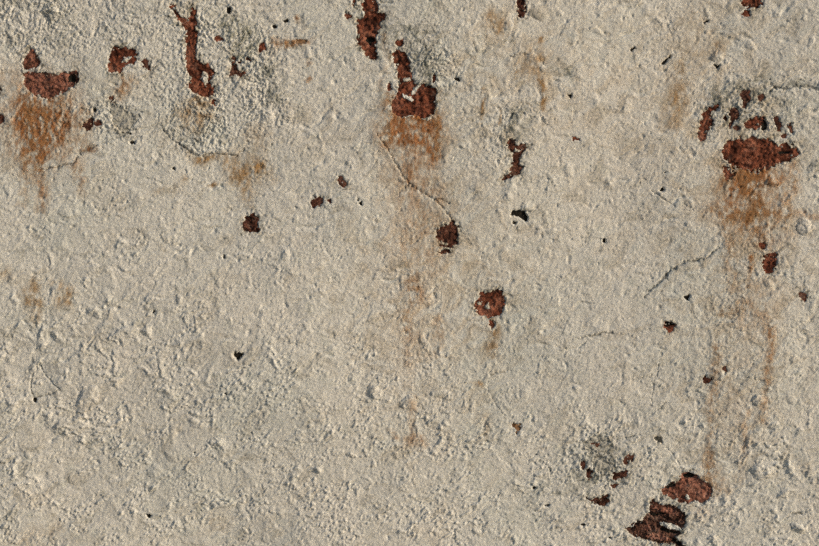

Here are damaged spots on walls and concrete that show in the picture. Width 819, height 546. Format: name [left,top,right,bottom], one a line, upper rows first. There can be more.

spalling [21,49,79,99]
spalling [106,43,151,75]
spalling [167,3,217,106]
spalling [344,0,386,60]
spalling [387,39,440,121]
corrosion [12,93,77,207]
corrosion [382,108,442,184]
spalling [697,89,802,180]
corrosion [719,165,785,227]
spalling [433,218,460,254]
spalling [471,287,506,330]
spalling [625,469,714,546]